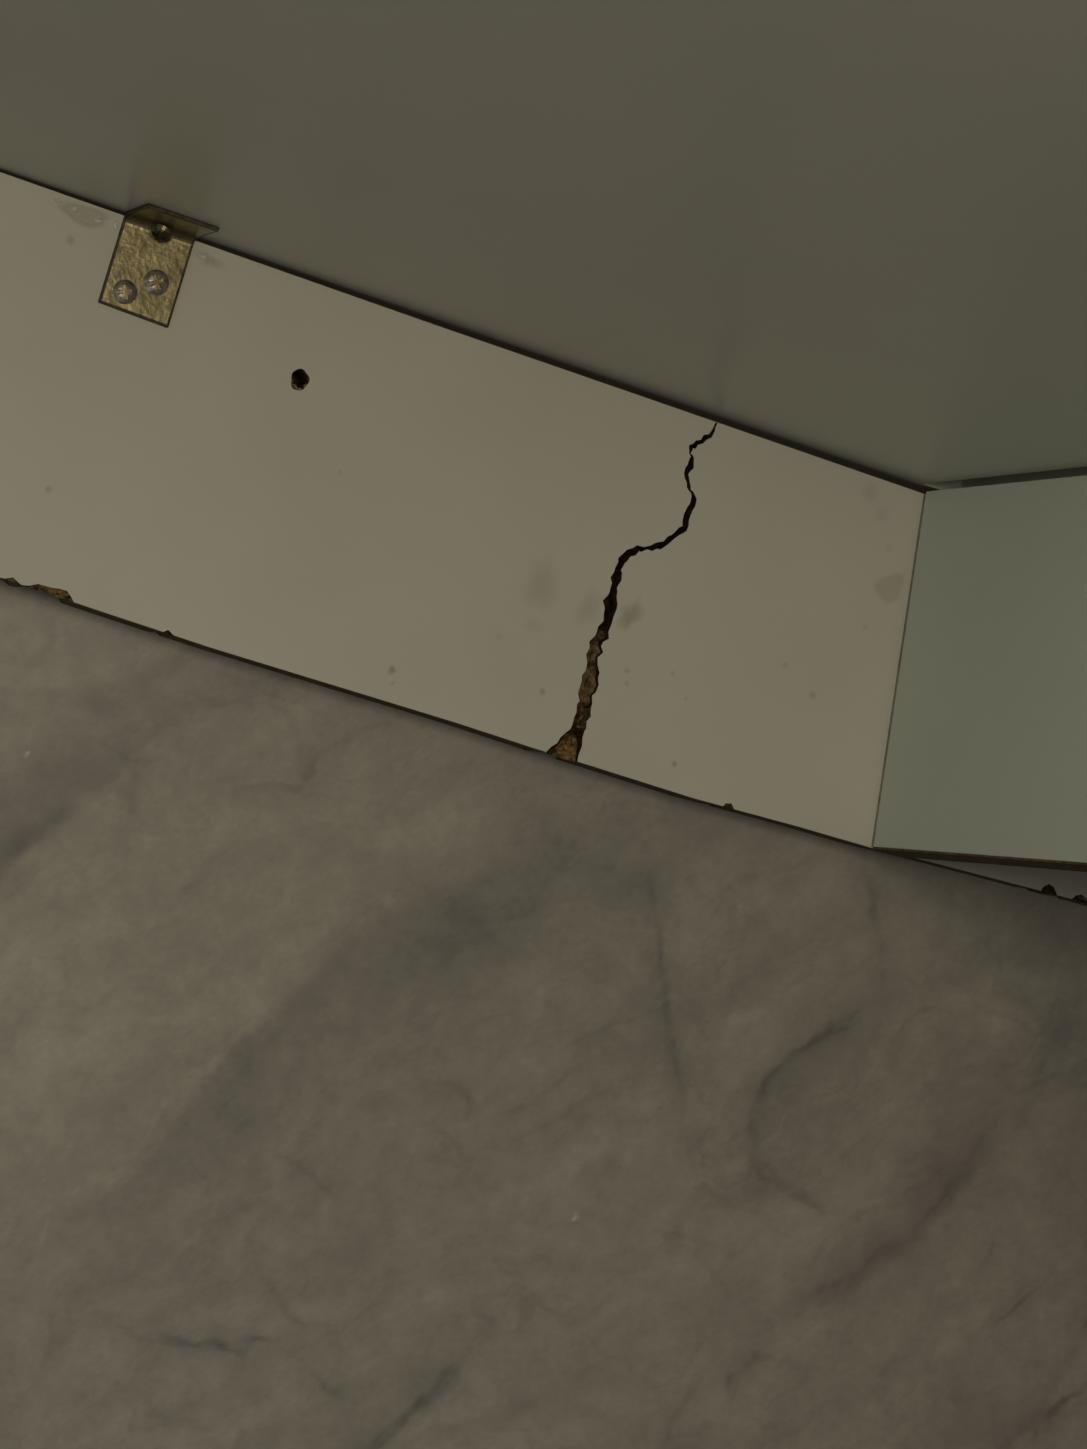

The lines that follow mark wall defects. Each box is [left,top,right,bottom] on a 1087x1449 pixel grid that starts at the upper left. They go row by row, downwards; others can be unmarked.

crack [544,422,717,762]